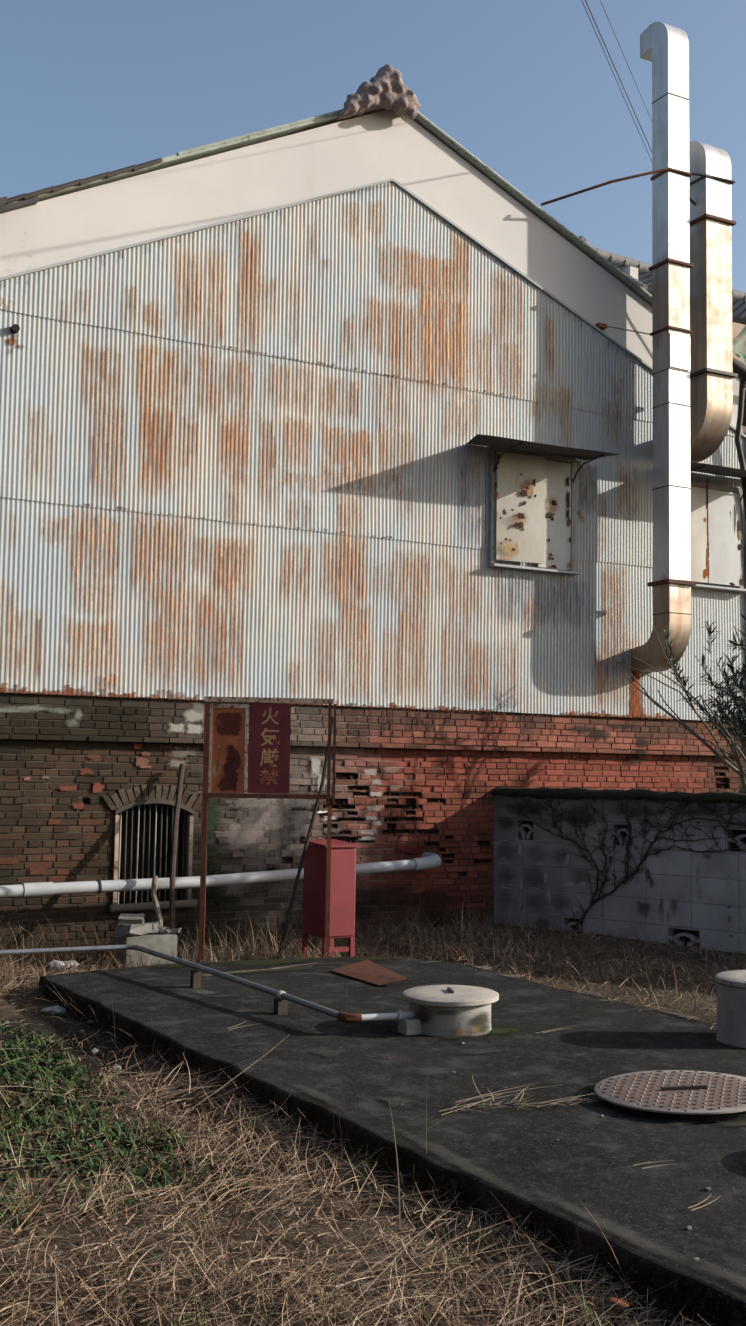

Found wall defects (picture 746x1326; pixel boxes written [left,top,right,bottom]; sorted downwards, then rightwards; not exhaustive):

rust [0,203,521,712]
rust [560,568,672,719]
spalling [243,773,491,876]